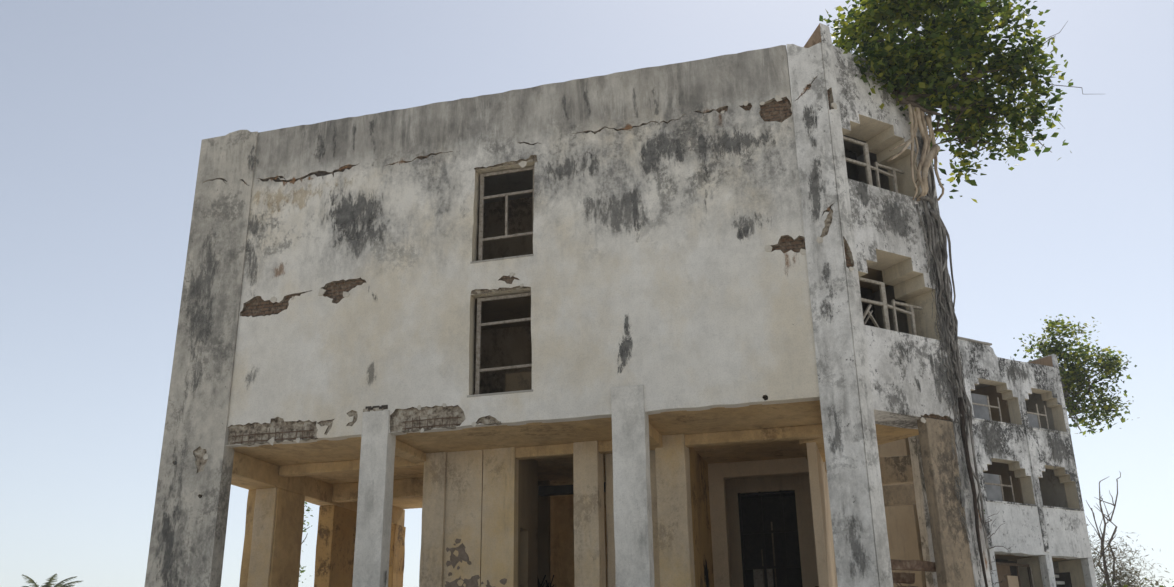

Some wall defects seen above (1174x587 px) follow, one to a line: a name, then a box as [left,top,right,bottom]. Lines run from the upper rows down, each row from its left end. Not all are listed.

crack [573,109,717,134]
flaking render [716,95,792,123]
crack [203,164,358,186]
crack [386,151,453,166]
water stain [808,160,825,220]
water stain [323,190,387,256]
flaking render [765,209,833,255]
flaking render [240,277,366,317]
water stain [883,201,963,410]
water stain [618,316,633,373]
flaking render [227,410,358,446]
flaking render [390,403,502,433]